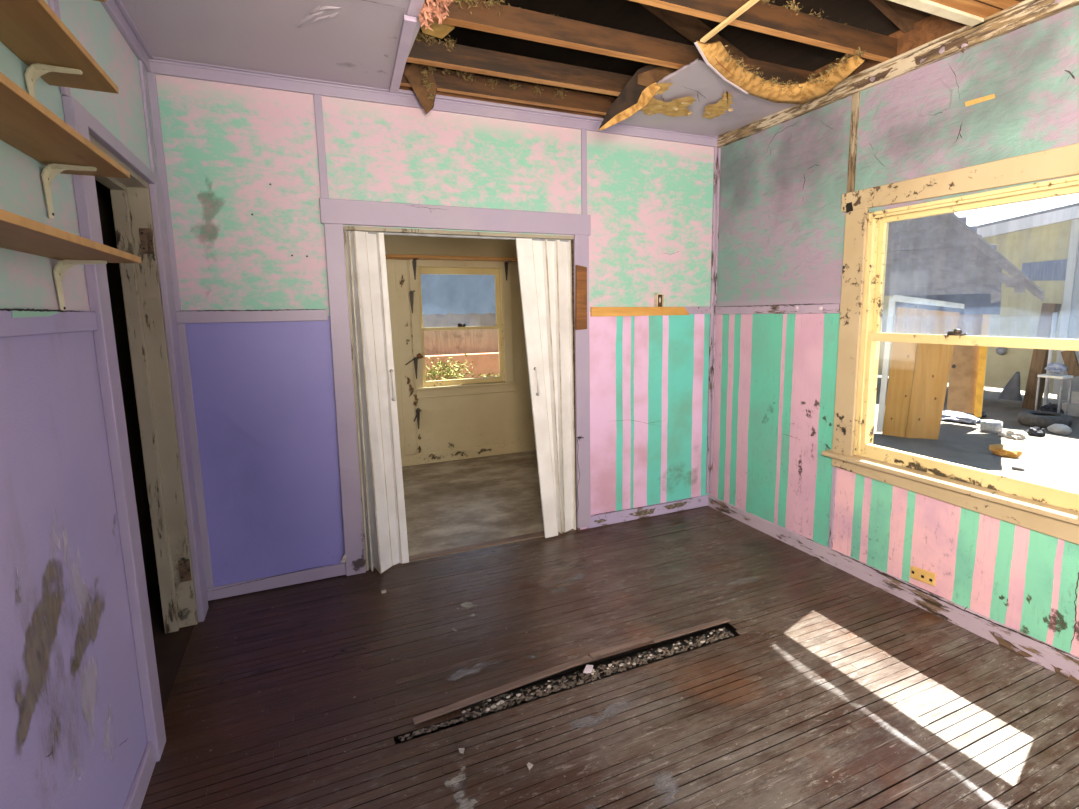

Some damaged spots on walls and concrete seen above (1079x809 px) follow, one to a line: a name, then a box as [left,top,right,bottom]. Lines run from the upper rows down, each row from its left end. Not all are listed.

peeling [914,36,968,65]
peeling [640,82,734,119]
peeling [853,68,893,89]
crack [836,551,1079,659]
water stain [16,561,64,745]
water stain [72,596,104,675]
peeling [990,632,1079,684]